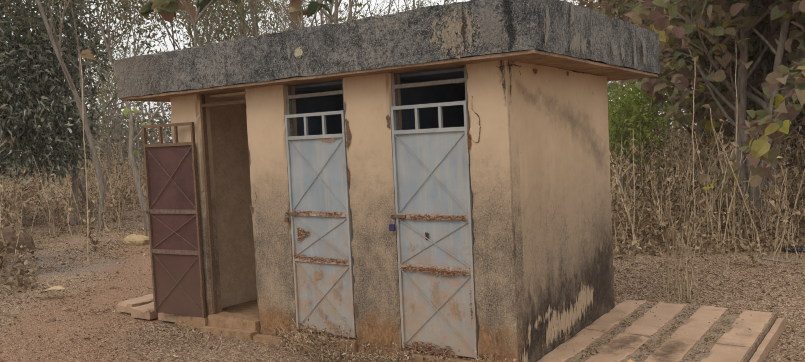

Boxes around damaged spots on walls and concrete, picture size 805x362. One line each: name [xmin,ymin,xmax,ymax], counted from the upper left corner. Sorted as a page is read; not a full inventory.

water stain [472,0,515,53]
corrosion [292,210,343,243]
corrosion [398,214,467,222]
corrosion [294,254,348,288]
corrosion [400,265,470,301]
water stain [521,243,615,362]
corrosion [405,339,475,361]